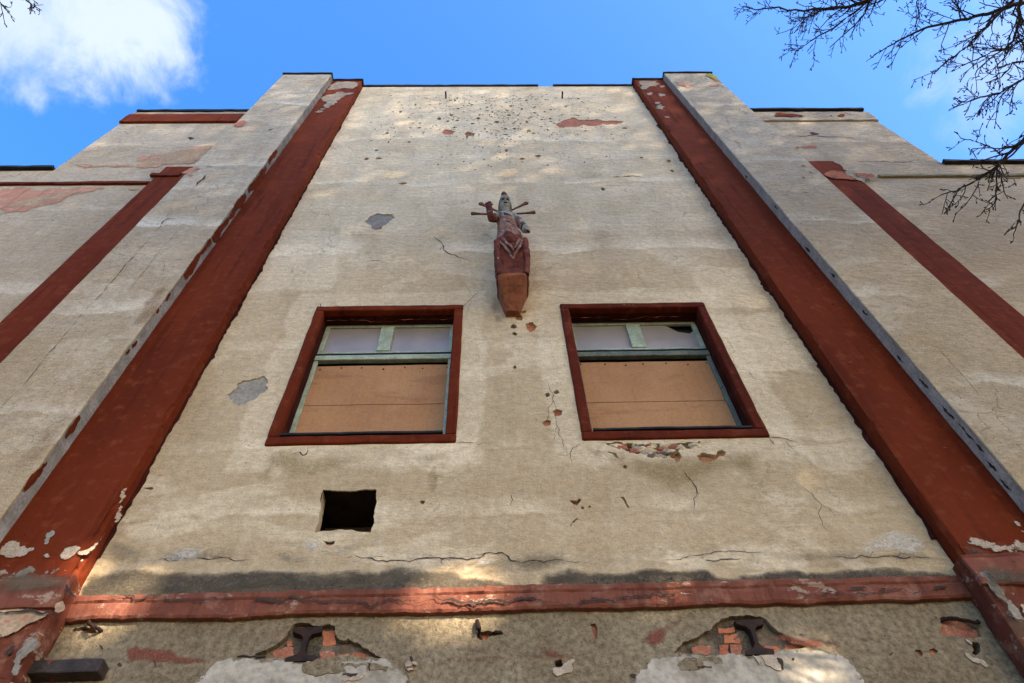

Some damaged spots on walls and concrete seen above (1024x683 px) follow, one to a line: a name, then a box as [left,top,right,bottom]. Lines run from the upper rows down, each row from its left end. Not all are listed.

peeling [316,81,358,113]
spalling [390,94,626,170]
flaking render [0,187,104,212]
crack [547,383,583,459]
spalling [609,441,725,469]
peeling [969,521,1024,552]
peeling [0,530,101,576]
crack [347,552,585,565]
crack [665,551,762,561]
crack [835,551,931,559]
flaking render [0,601,65,683]
spalling [676,619,799,656]